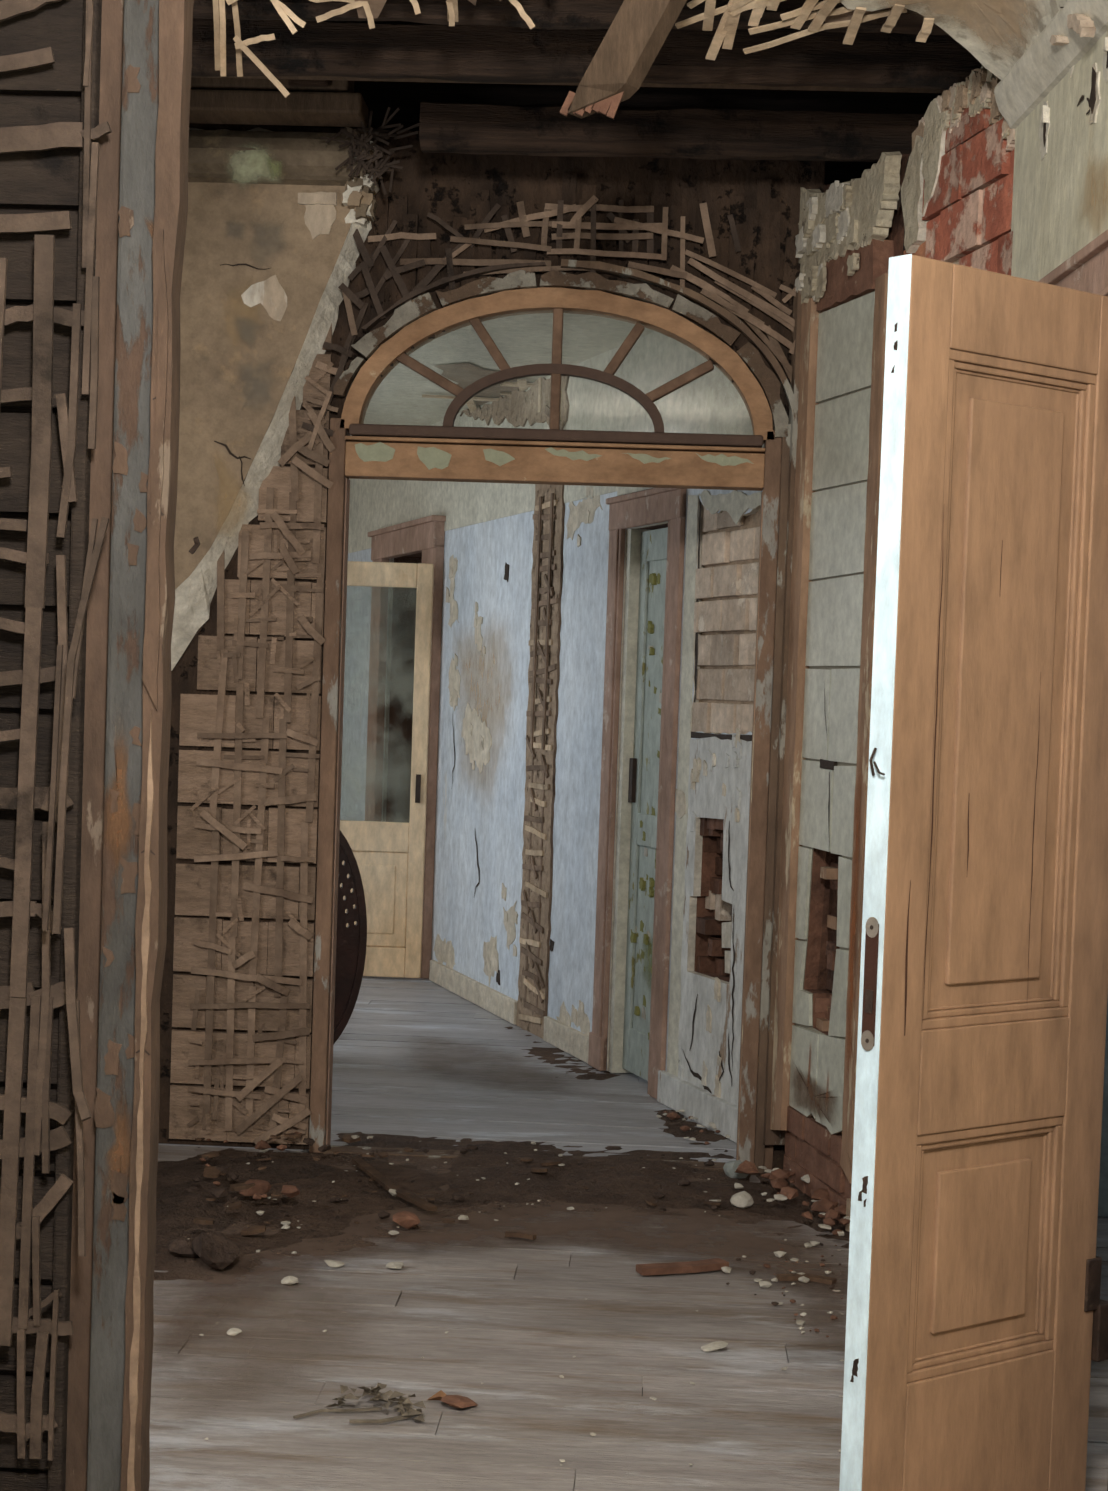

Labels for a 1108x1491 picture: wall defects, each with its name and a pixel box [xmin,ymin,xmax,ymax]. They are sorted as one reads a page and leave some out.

damp [886,0,1028,46]
flaking render [1050,14,1108,125]
flaking render [795,65,1015,304]
flaking render [241,275,287,321]
peeling [355,442,395,462]
peeling [417,446,452,470]
peeling [483,449,515,466]
peeling [545,447,602,461]
peeling [696,453,753,466]
peeling [675,490,762,1106]
peeling [858,1176,868,1207]
peeling [850,1358,859,1382]